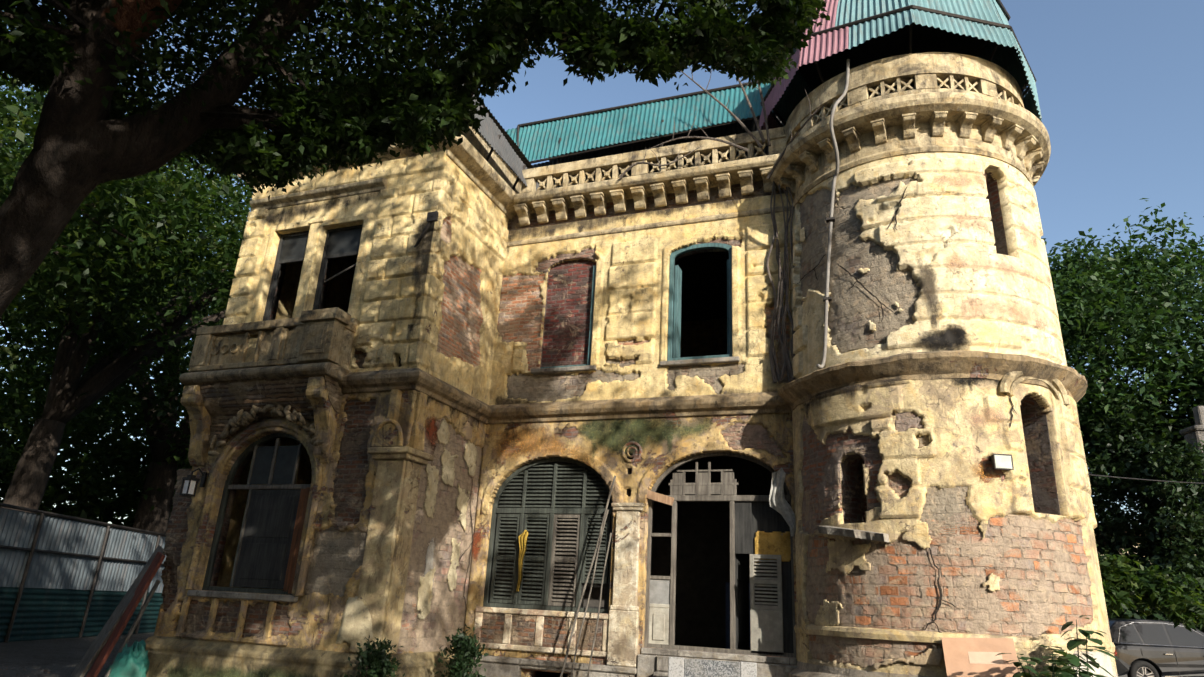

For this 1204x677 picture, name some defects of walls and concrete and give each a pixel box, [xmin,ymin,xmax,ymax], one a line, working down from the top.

flaking render [161,469,291,638]
flaking render [304,399,376,597]
flaking render [398,418,482,653]
flaking render [436,216,483,367]
flaking render [497,247,650,402]
leakage [580,418,709,454]
flaking render [667,363,745,394]
flaking render [799,177,922,354]
crack [887,187,907,230]
crack [920,548,956,633]
leakage [916,267,968,351]
flaking render [801,411,1093,669]